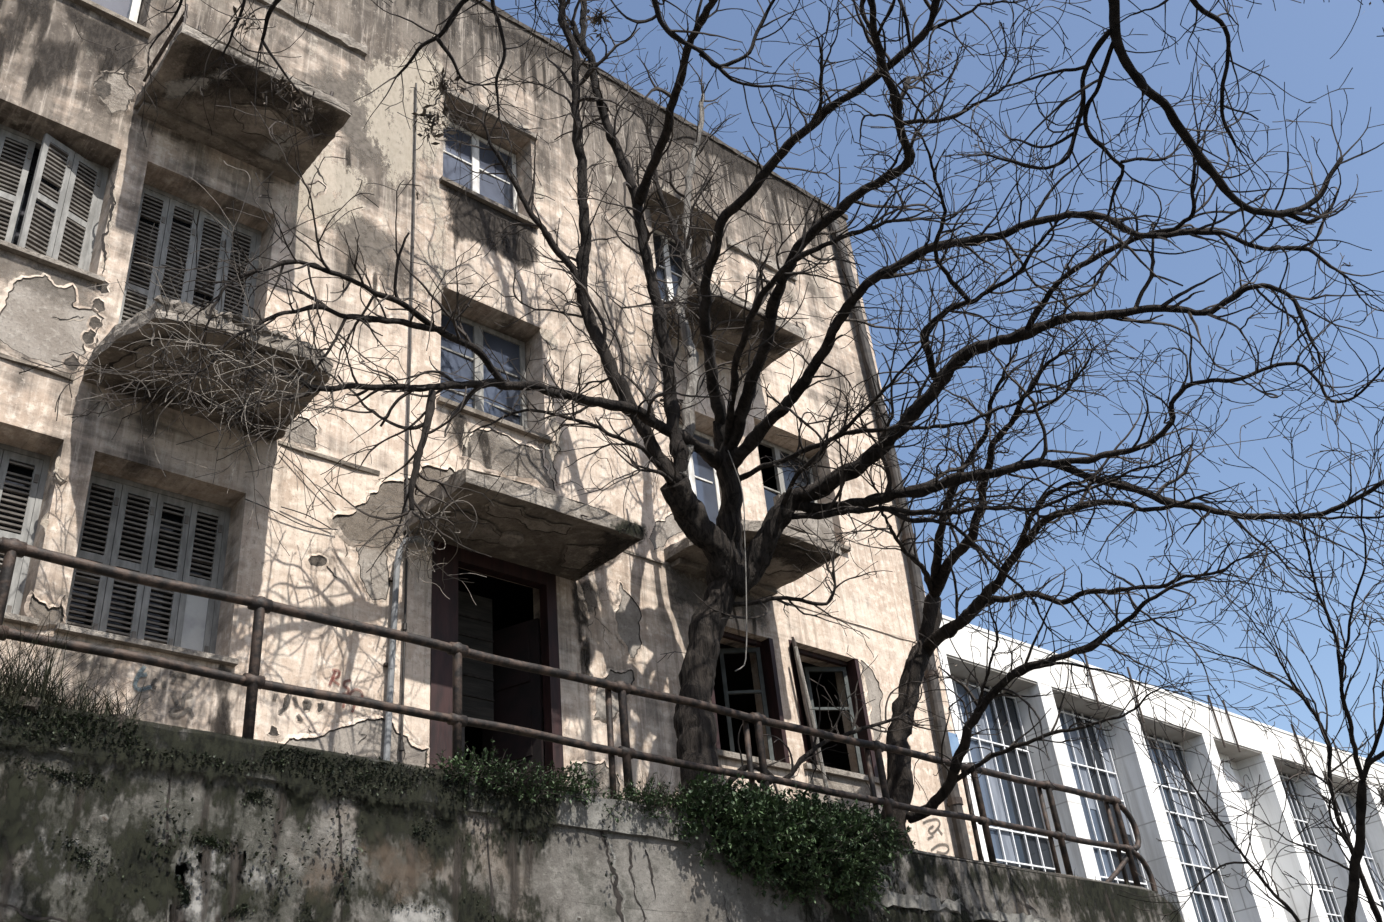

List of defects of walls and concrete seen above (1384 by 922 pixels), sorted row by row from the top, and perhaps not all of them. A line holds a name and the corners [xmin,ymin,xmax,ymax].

leakage [0,0,136,99]
leakage [152,42,538,305]
leakage [408,0,826,244]
flaking render [0,272,111,376]
flaking render [540,328,558,349]
spalling [328,408,564,602]
flaking render [592,581,643,723]
flaking render [254,694,430,767]
leakage [172,797,285,922]
leakage [393,843,449,922]
leakage [504,834,533,915]
crack [600,831,656,922]